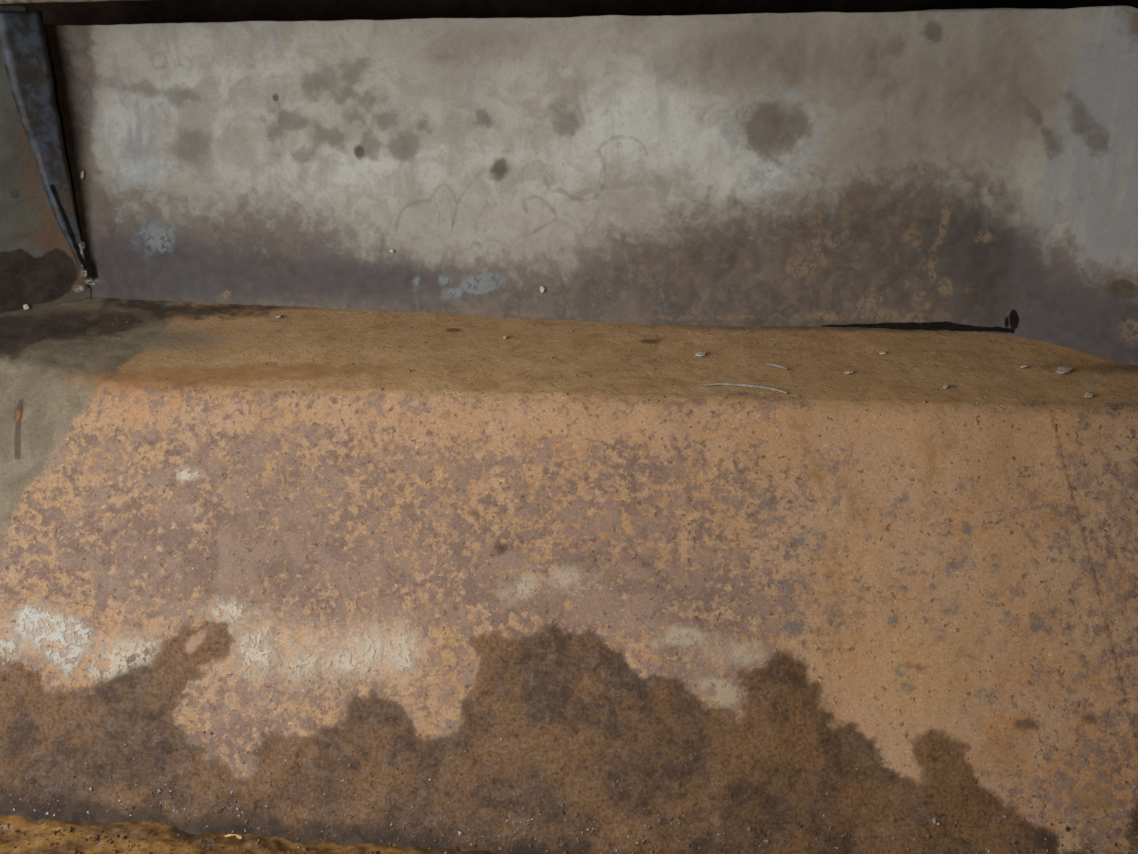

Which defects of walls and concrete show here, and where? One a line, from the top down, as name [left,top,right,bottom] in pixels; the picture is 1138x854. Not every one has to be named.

water stain [0,249,270,359]
water stain [0,601,1092,854]